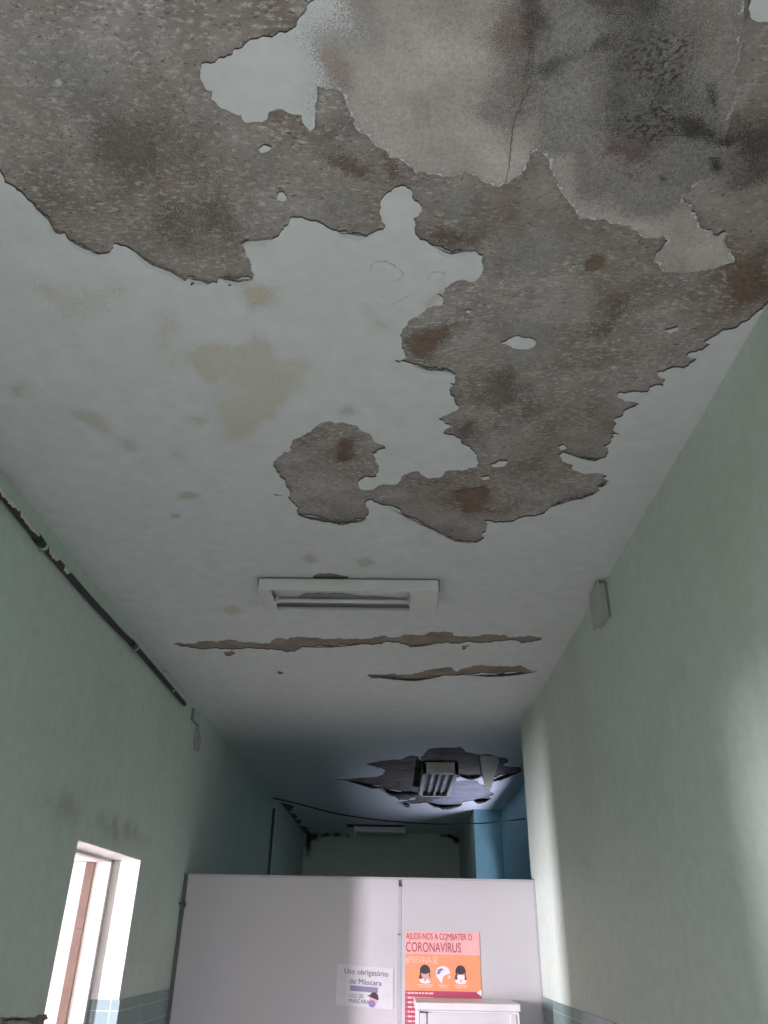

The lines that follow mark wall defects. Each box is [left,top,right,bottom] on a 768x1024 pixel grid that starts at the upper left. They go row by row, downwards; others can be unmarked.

crack [505,0,537,185]
damp [295,0,768,277]
peeling [0,0,768,543]
peeling [175,631,543,656]
peeling [367,665,538,682]
peeling [334,747,524,810]